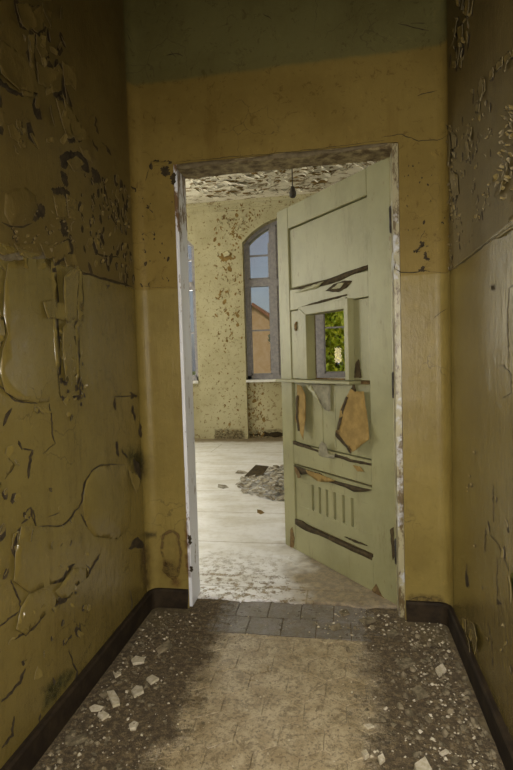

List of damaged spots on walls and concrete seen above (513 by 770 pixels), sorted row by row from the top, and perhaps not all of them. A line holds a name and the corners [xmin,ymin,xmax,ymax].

peeling [441,50,513,271]
peeling [0,134,176,421]
peeling [189,160,378,438]
crack [499,285,513,398]
peeling [0,512,91,645]
spalling [99,689,120,708]